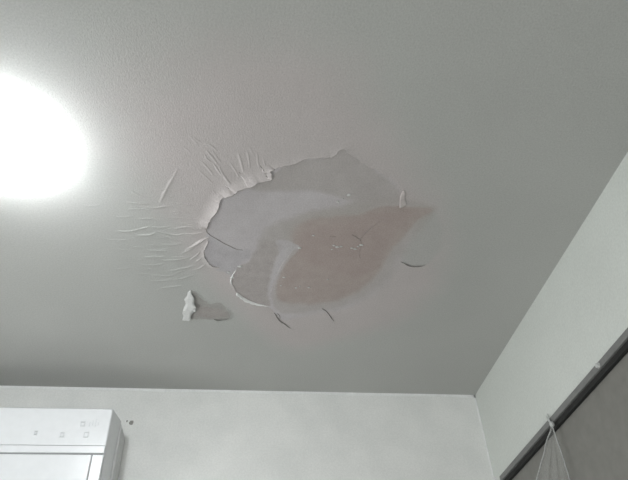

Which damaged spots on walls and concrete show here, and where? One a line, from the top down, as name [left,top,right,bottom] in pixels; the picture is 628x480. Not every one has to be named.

peeling [182,289,235,322]
leakage [0,0,497,367]
peeling [195,140,409,324]